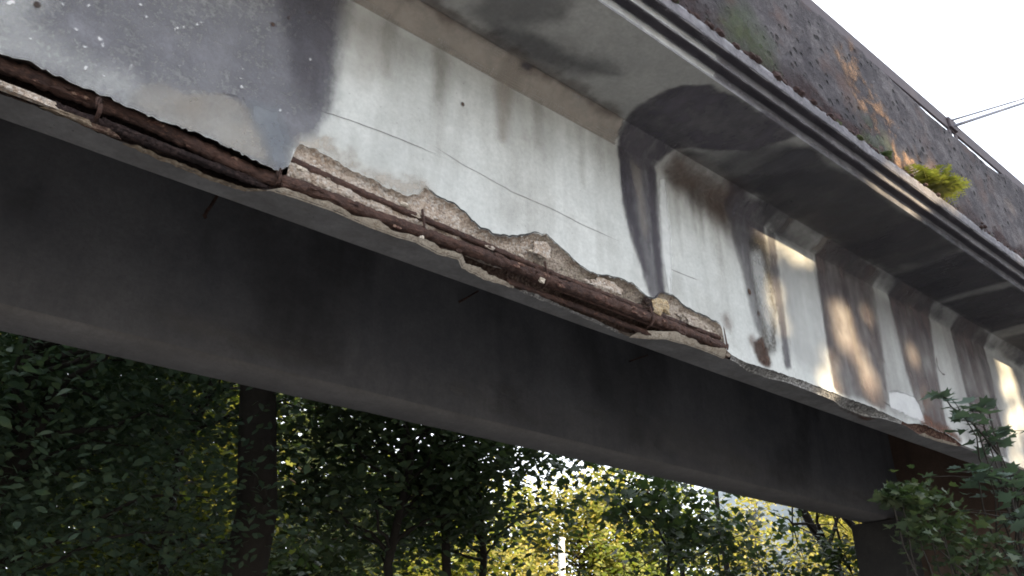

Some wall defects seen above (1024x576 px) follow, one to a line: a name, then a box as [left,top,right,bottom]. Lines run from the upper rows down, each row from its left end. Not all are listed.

damp [0,0,338,170]
spalling [0,54,731,359]
crack [323,111,616,240]
damp [353,0,1024,453]
corrosion [755,337,771,366]
spalling [901,421,962,446]